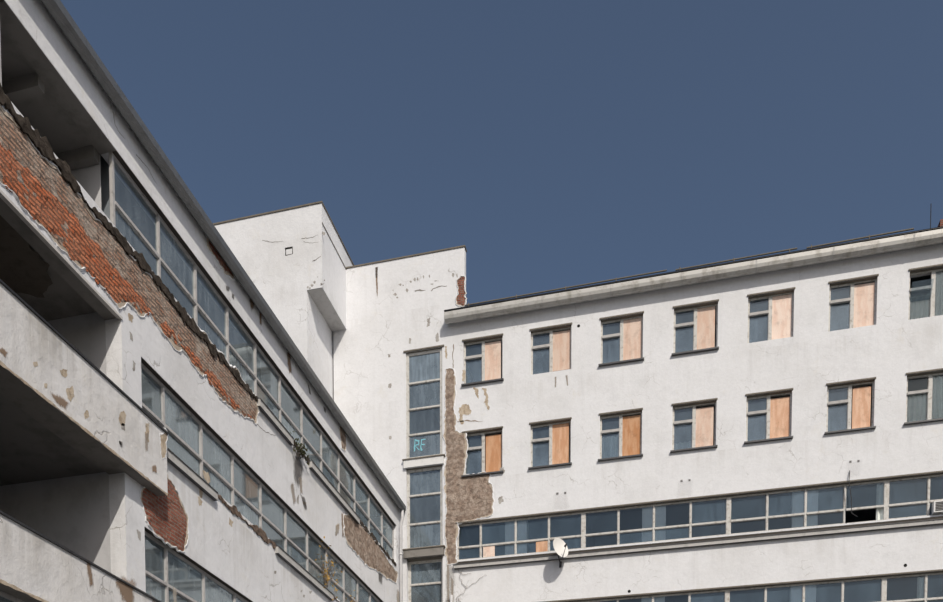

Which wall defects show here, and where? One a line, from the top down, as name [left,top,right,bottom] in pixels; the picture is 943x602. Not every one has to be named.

spalling [0,83,260,426]
spalling [393,273,467,307]
spalling [0,361,189,553]
spalling [335,513,398,584]
spalling [427,318,505,566]